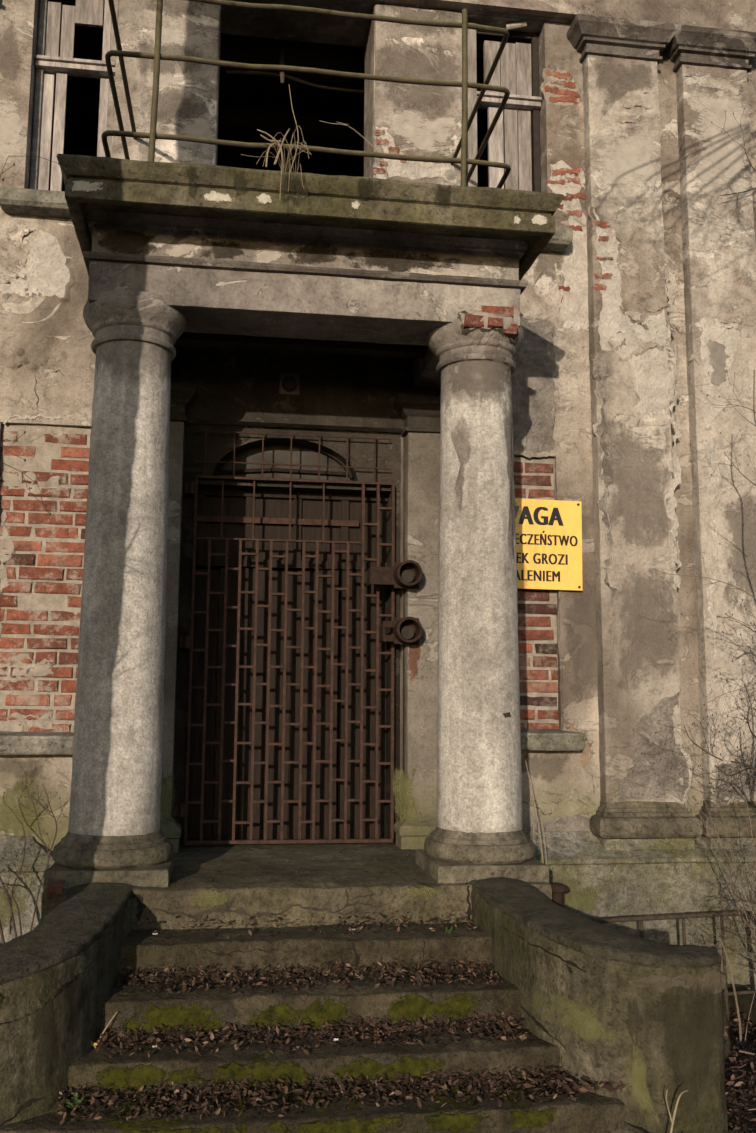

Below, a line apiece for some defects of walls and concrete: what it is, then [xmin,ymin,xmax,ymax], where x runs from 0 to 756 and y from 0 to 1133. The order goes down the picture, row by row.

flaking render [540,65,584,111]
crack [18,227,36,244]
crack [0,272,42,296]
spalling [457,160,744,666]
crack [131,889,388,956]